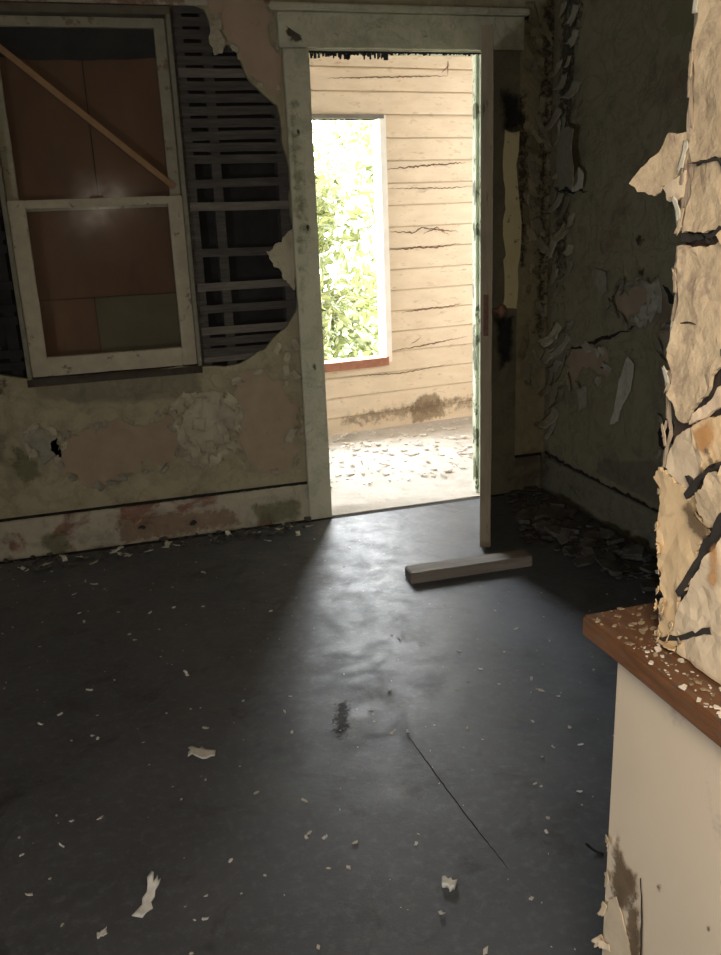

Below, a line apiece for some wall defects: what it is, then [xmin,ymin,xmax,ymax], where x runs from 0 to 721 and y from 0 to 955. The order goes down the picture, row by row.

crack [688,158,721,166]
flaking render [167,0,302,381]
crack [681,226,721,244]
flaking render [607,0,721,685]
leakage [349,394,472,424]
crack [695,393,715,423]
crack [675,461,721,597]
crack [656,627,712,642]
peeling [591,897,631,955]